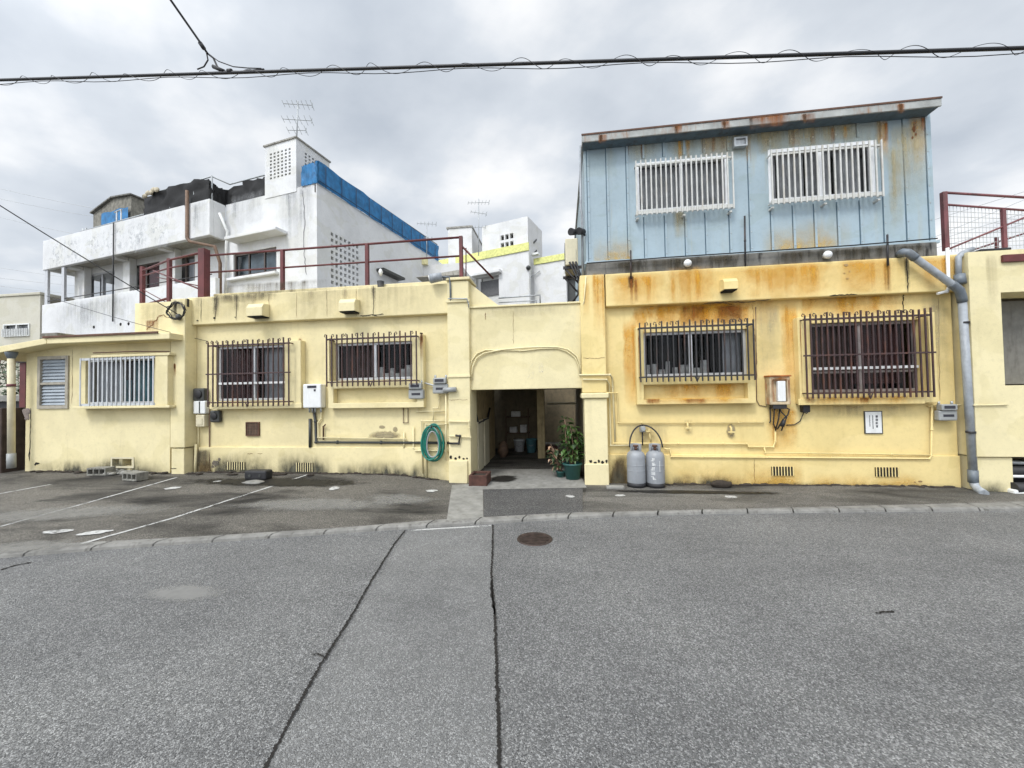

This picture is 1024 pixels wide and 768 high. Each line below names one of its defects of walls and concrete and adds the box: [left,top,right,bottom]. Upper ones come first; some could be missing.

corrosion [750,114,814,139]
corrosion [620,276,649,292]
damp [193,451,260,472]
damp [282,461,326,473]
damp [767,475,796,485]